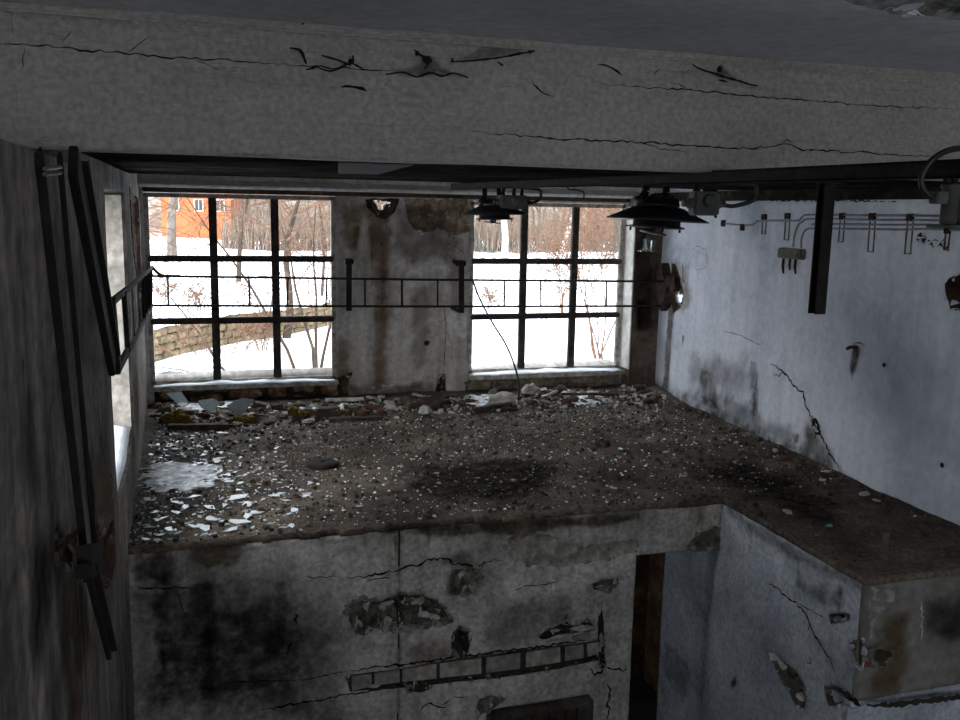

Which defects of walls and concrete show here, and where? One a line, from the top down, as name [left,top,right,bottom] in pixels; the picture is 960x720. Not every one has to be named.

crack [10,30,390,72]
crack [474,131,948,158]
flaking render [365,198,473,237]
spalling [945,274,960,313]
crack [723,331,840,471]
water stain [786,427,832,468]
crack [302,557,502,582]
water stain [162,585,294,699]
crack [241,601,626,720]
flaking render [342,564,606,694]
flaking render [768,652,810,713]
crack [769,583,960,708]